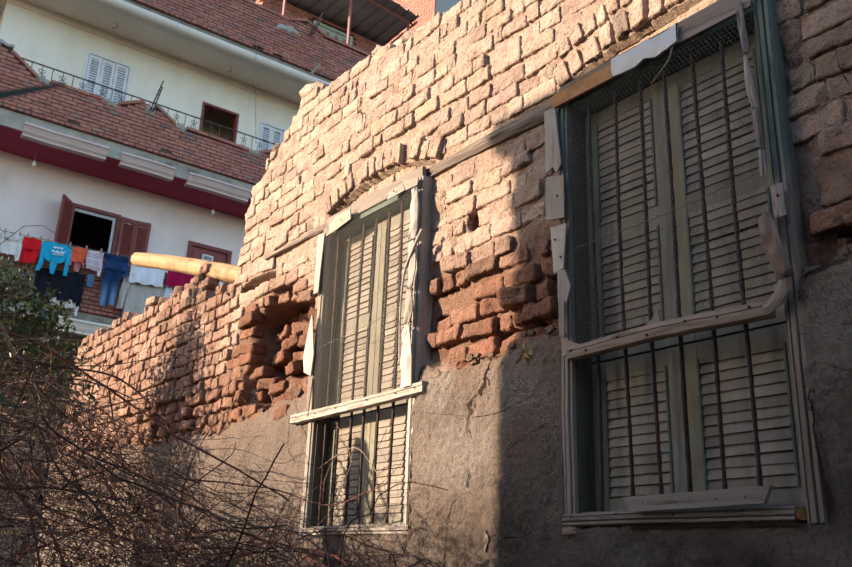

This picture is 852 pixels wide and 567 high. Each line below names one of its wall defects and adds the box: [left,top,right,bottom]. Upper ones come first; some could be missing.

spalling [457,325,559,369]
crack [427,360,537,440]
spalling [201,415,252,436]